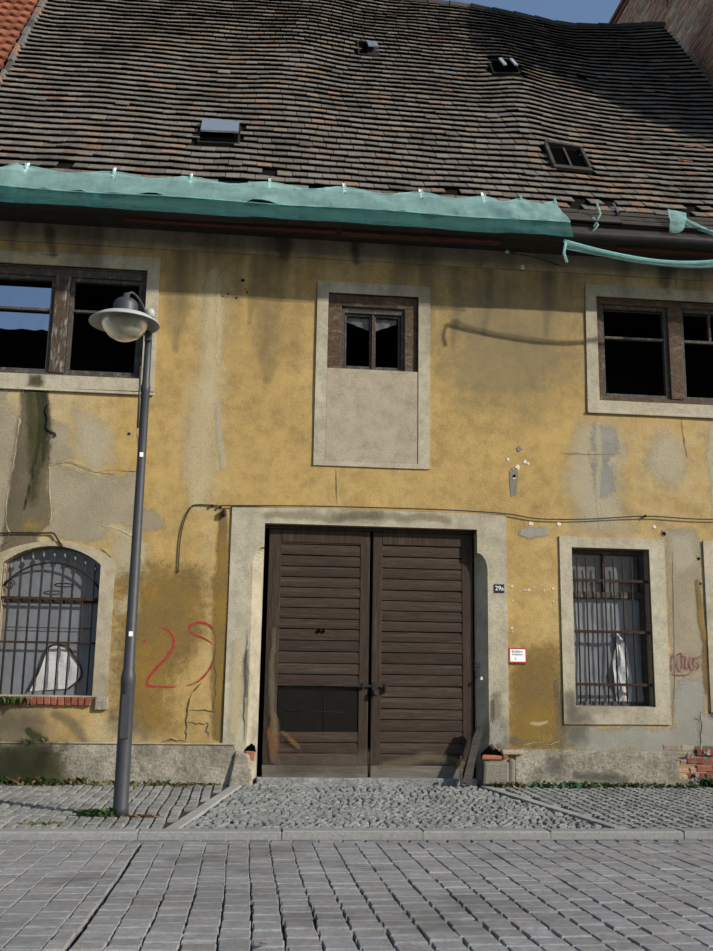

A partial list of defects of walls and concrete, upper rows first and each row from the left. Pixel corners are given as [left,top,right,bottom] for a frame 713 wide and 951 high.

damp [1,390,51,561]
peeling [42,418,165,581]
peeling [568,422,622,529]
crack [161,653,217,743]
crack [233,629,251,758]
flaking render [663,744,713,787]